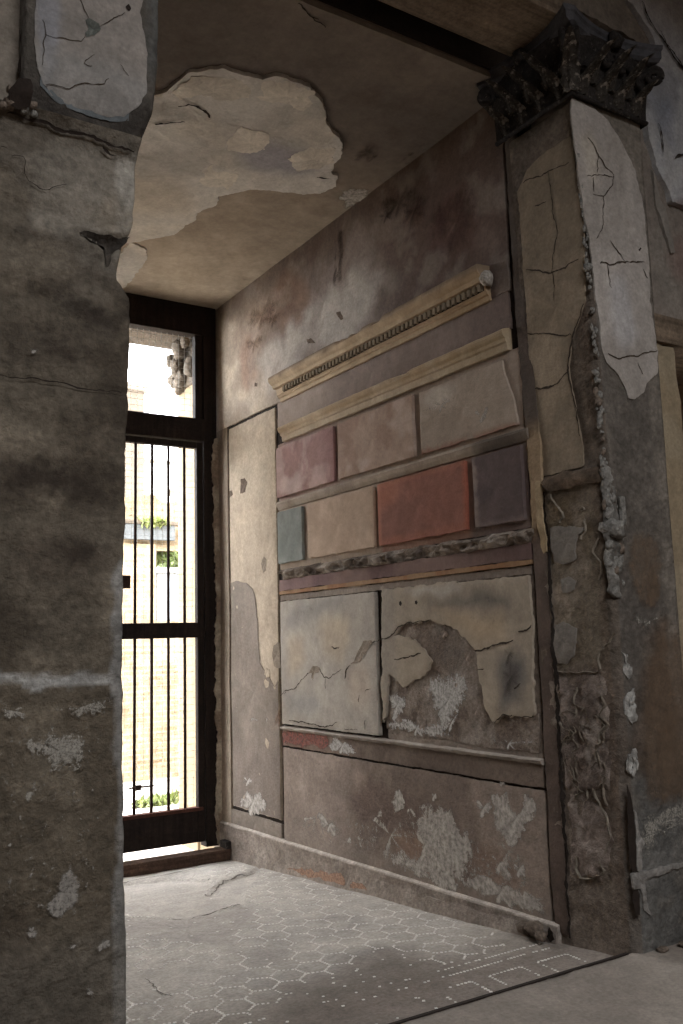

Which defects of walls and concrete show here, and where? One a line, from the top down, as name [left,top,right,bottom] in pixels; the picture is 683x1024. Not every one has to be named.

crack [18,0,129,89]
peeling [0,0,343,288]
crack [523,138,648,300]
crack [608,351,657,374]
damp [0,700,110,802]
spalling [231,581,281,819]
crack [280,646,369,730]
spalling [386,620,540,753]
spalling [553,622,616,881]
peeling [621,651,638,725]
peeling [626,748,639,776]
crack [123,860,251,920]